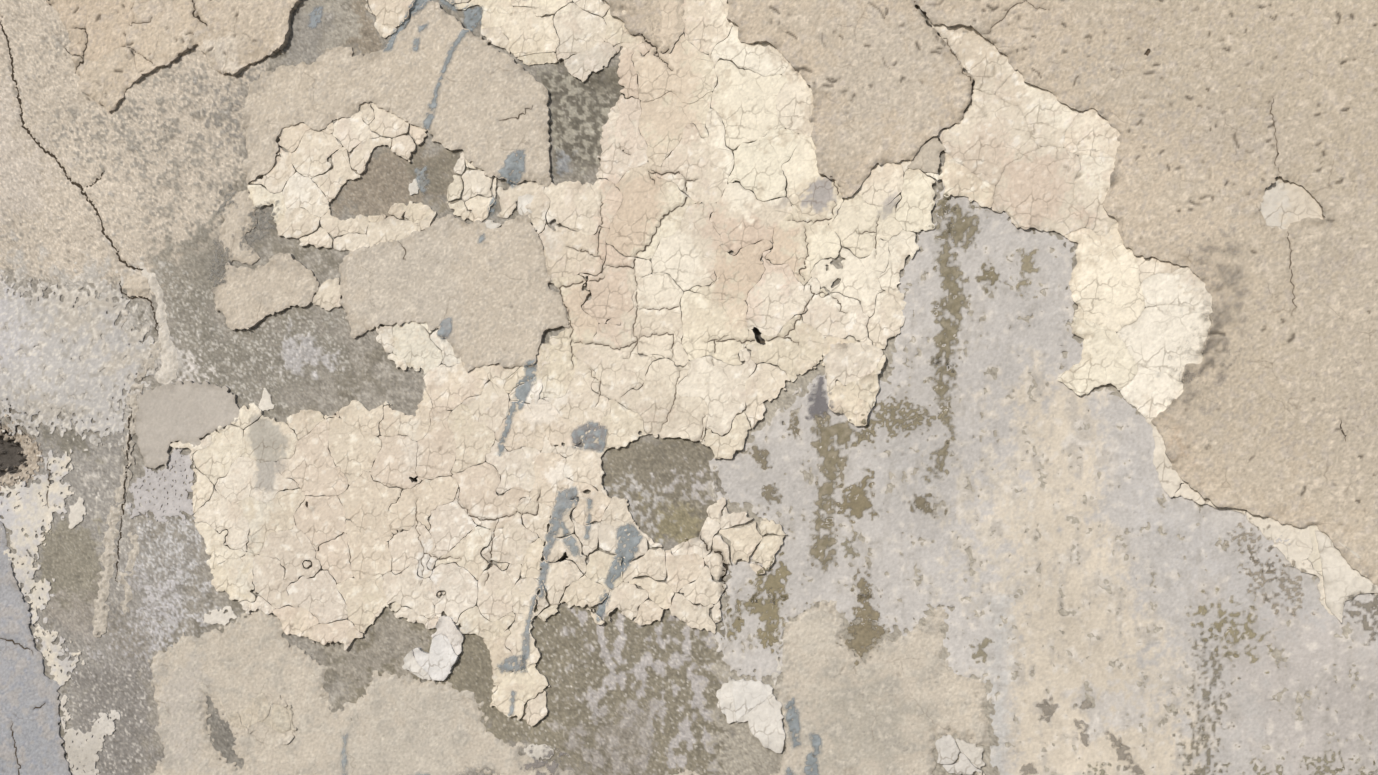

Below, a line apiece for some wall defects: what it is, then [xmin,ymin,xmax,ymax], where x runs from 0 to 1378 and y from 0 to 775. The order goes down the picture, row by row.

crack [634,33,673,71]
crack [914,0,974,123]
crack [987,0,1047,34]
crack [0,16,158,334]
crack [559,143,705,441]
peeling [125,0,1213,775]
crack [708,175,879,366]
peeling [0,262,161,775]
crack [415,493,541,585]
crack [700,535,728,593]